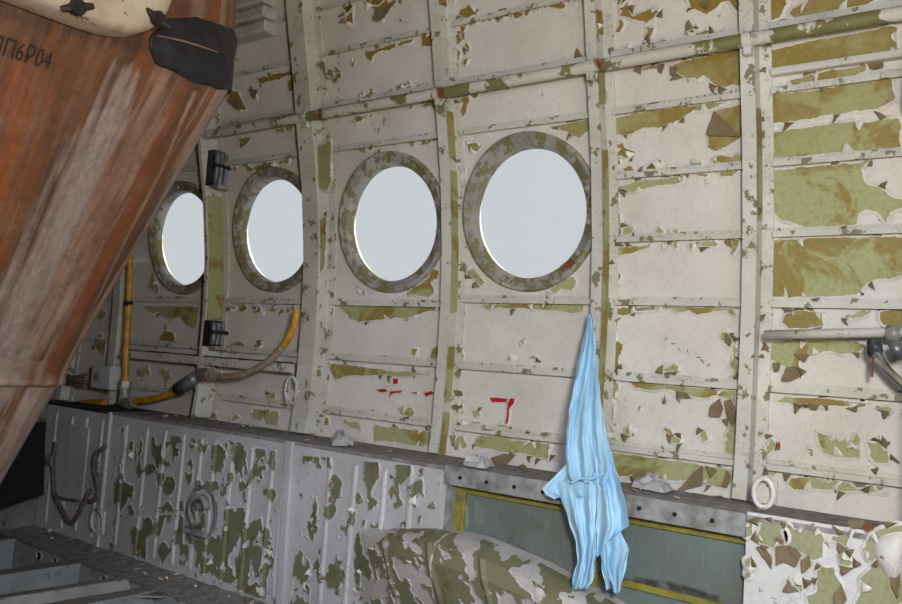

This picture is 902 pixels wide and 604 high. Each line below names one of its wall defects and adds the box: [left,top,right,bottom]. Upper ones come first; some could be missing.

peeling [337,0,402,46]
peeling [596,0,739,49]
peeling [766,0,880,22]
peeling [551,115,590,142]
peeling [335,80,491,326]
peeling [757,22,902,383]
peeling [480,275,586,316]
peeling [599,48,742,502]
peeling [774,394,895,419]
peeling [762,417,900,500]
peeling [40,427,278,604]
peeling [741,503,902,604]